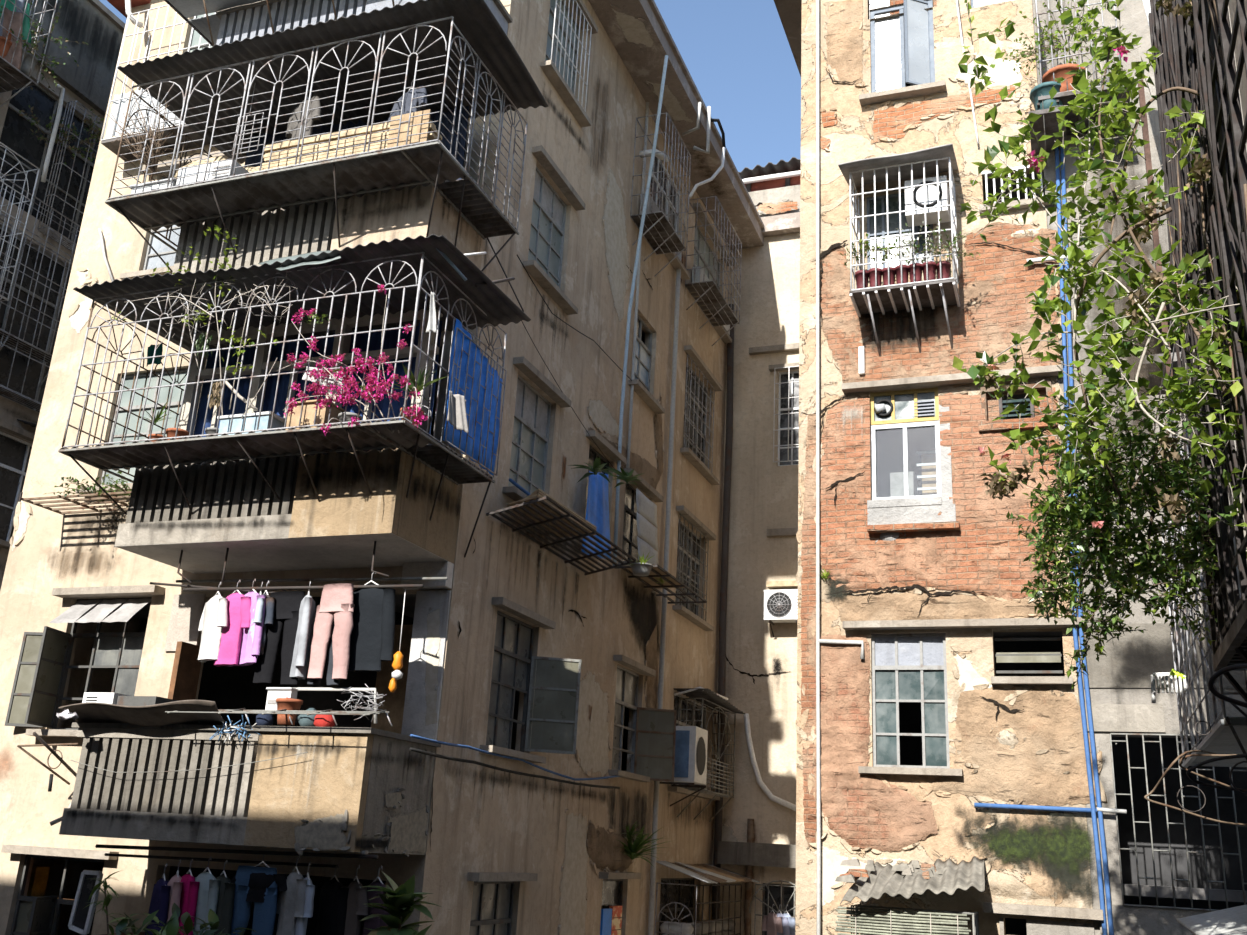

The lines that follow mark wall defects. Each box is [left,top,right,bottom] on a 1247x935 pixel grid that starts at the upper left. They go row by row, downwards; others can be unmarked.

peeling [865,52,1029,144]
peeling [819,107,841,152]
crack [820,240,847,323]
crack [814,397,843,435]
damp [74,511,117,537]
damp [53,548,101,571]
peeling [795,220,1107,905]
crack [825,584,987,616]
crack [980,696,1024,720]
spalling [294,788,430,856]
damp [957,808,1095,904]